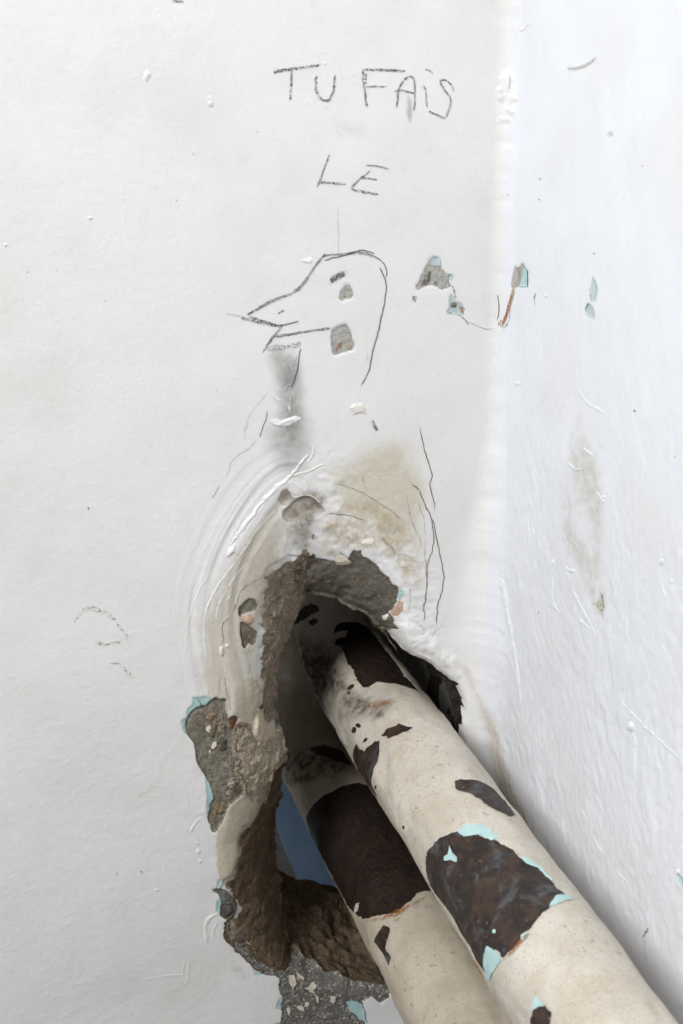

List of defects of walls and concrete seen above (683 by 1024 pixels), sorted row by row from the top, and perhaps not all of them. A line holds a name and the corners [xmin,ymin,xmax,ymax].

peeling [339,285,353,301]
peeling [413,256,465,316]
peeling [498,263,528,327]
peeling [331,324,354,355]
spalling [424,659,464,735]
spalling [181,534,404,1024]